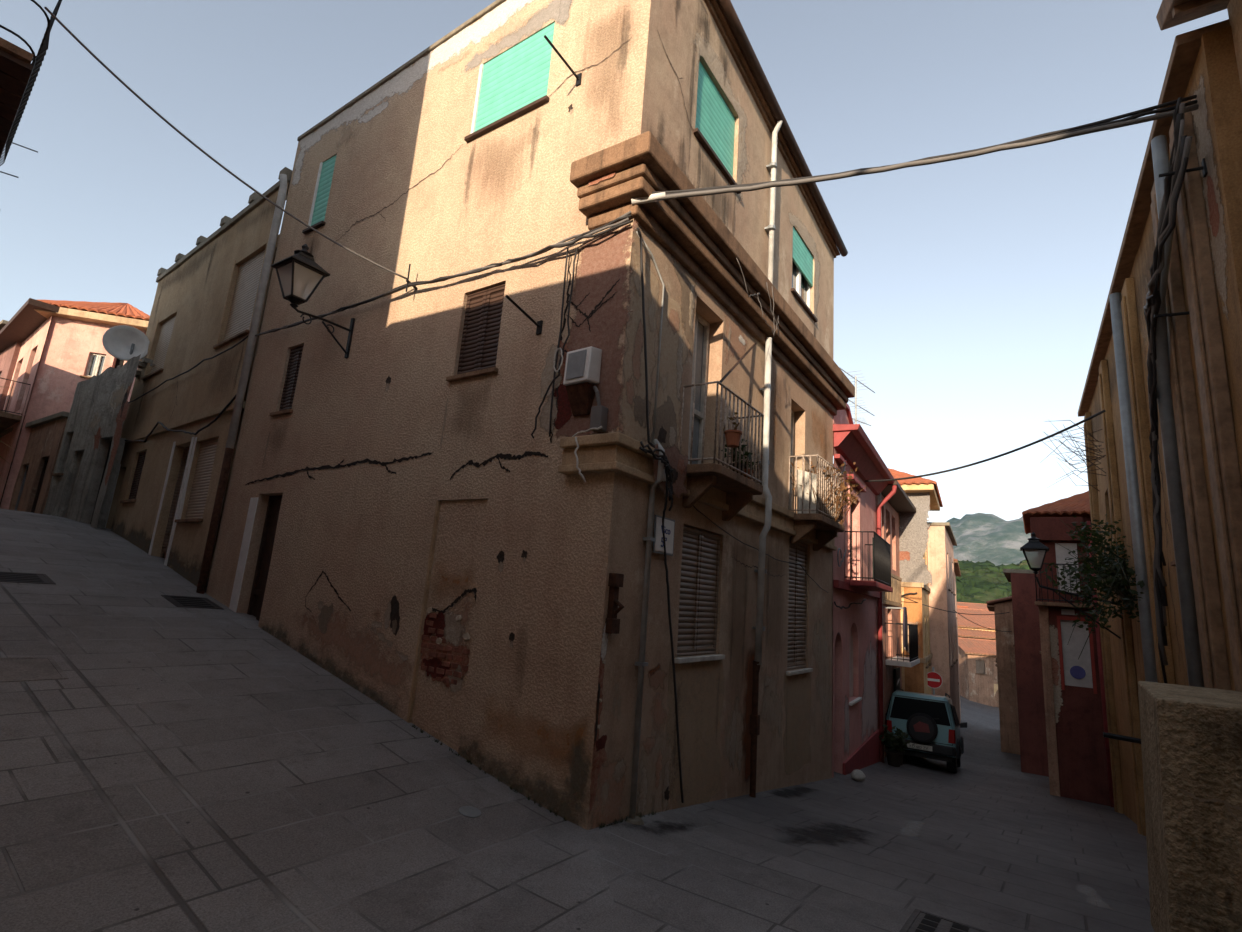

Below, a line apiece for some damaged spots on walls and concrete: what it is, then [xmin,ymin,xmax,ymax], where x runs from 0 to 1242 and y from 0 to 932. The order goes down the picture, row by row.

peeling [292,0,533,185]
crack [560,254,620,353]
crack [246,386,559,485]
crack [305,571,351,612]
spalling [420,588,477,692]
spalling [589,623,608,813]